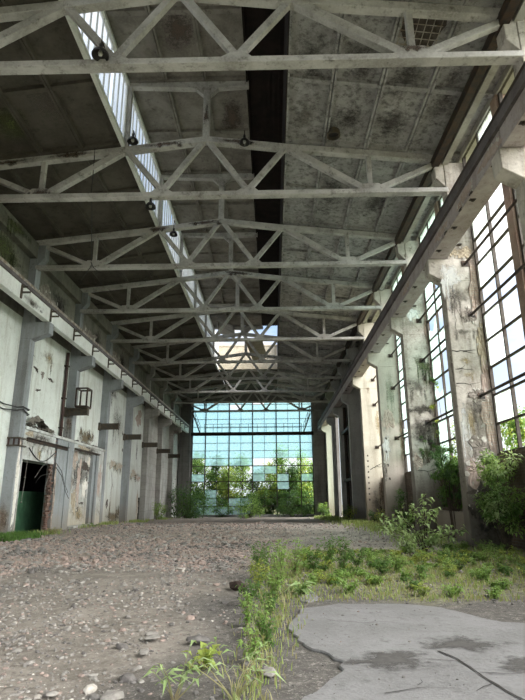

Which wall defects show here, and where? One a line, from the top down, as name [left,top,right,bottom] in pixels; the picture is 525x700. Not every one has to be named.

leakage [441,266,465,313]
spalling [450,246,497,494]
leakage [409,363,432,445]
spalling [70,445,91,514]
leakage [345,651,418,669]
leakage [431,636,493,651]
crack [438,651,525,700]